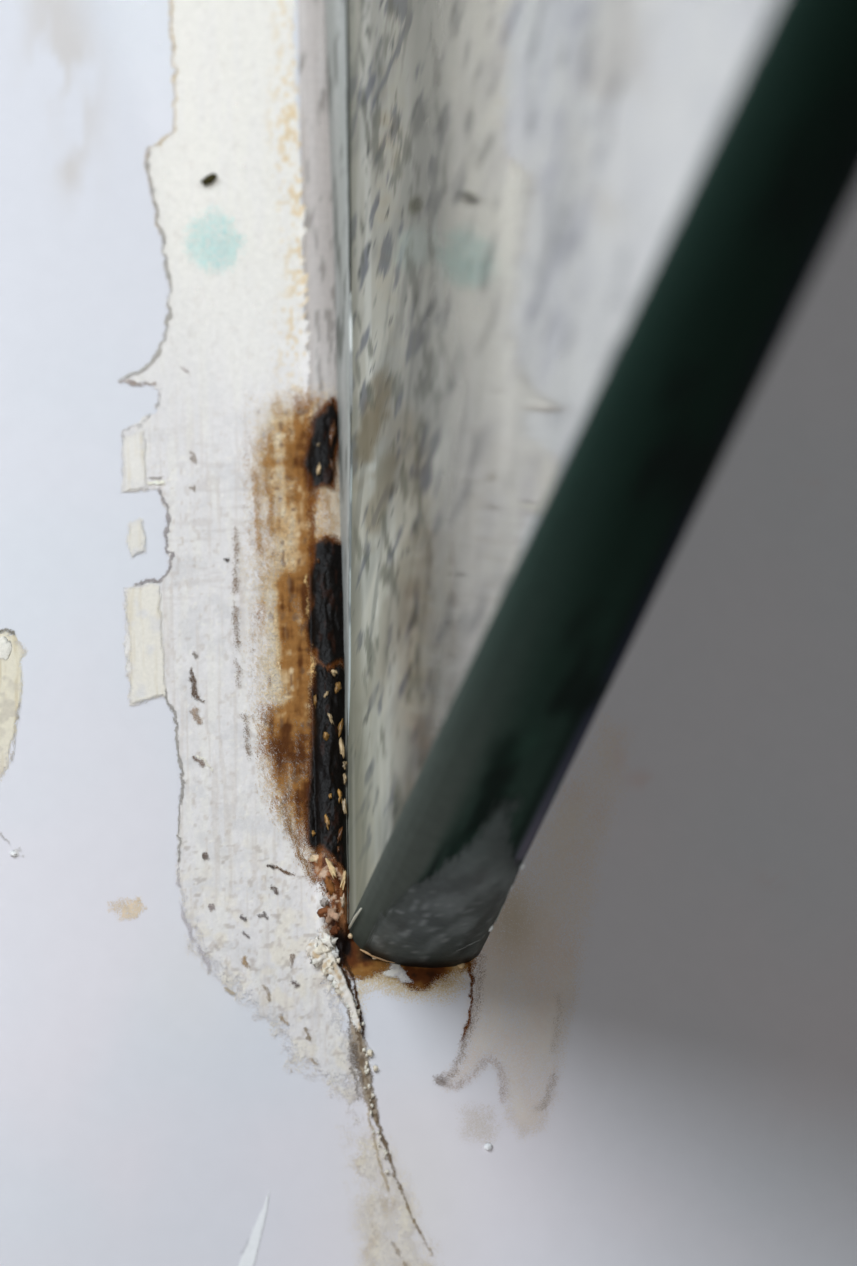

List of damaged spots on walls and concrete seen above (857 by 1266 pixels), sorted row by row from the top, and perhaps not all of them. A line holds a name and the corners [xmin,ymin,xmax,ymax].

peeling [0,627,27,783]
peeling [118,0,443,1266]
corrosion [231,382,483,1042]
crack [338,954,433,1265]